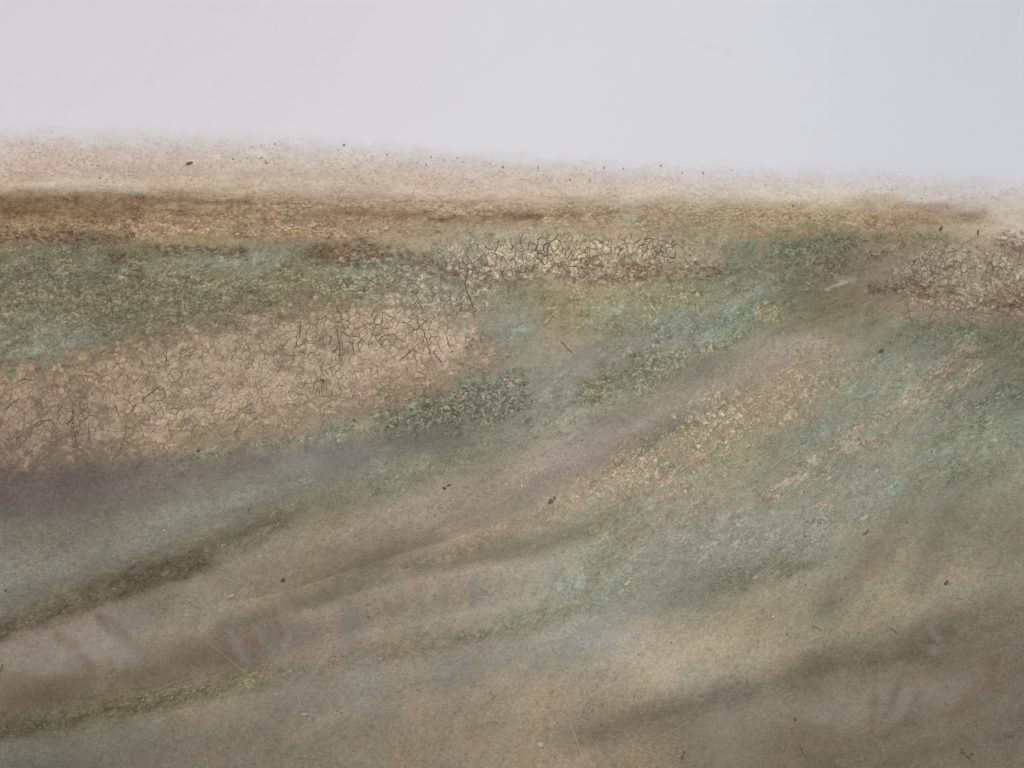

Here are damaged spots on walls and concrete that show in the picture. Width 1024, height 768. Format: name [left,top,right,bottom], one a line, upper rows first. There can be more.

crack [0,225,744,476]
crack [868,235,1024,342]